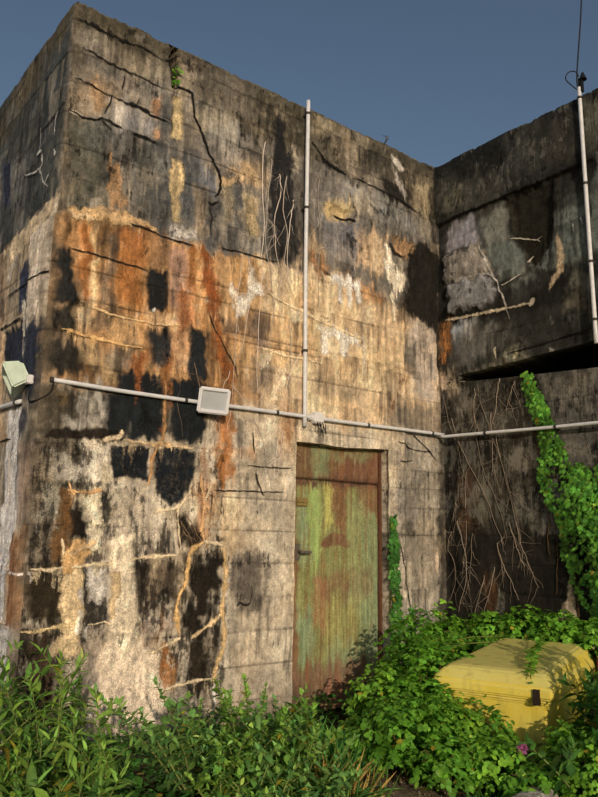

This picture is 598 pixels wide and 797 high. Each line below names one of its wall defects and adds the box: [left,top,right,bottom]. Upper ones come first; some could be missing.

crack [76,17,175,67]
leakage [4,216,49,397]
leakage [53,249,77,331]
rust [79,224,93,278]
crack [13,47,279,262]
rust [180,245,235,404]
leakage [268,116,299,262]
leakage [0,404,22,673]
leakage [21,327,207,725]
crack [0,433,289,705]
leakage [183,555,222,699]
rust [216,414,235,488]